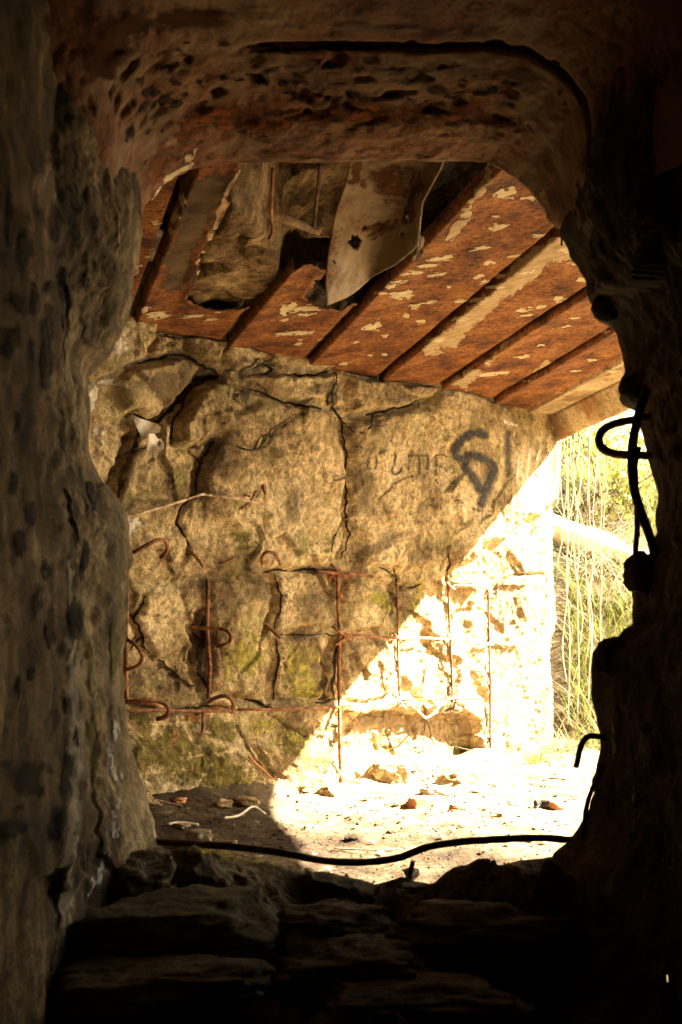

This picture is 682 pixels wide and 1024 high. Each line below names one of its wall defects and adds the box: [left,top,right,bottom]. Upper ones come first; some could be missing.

peeling [151,192,188,237]
spalling [151,149,197,201]
rust [347,150,424,240]
peeling [422,163,586,356]
peeling [141,306,221,321]
peeling [275,302,323,346]
peeling [354,322,388,344]
peeling [374,255,453,325]
peeling [451,338,550,391]
crack [117,354,422,777]
crack [492,562,540,611]
crack [420,662,431,741]